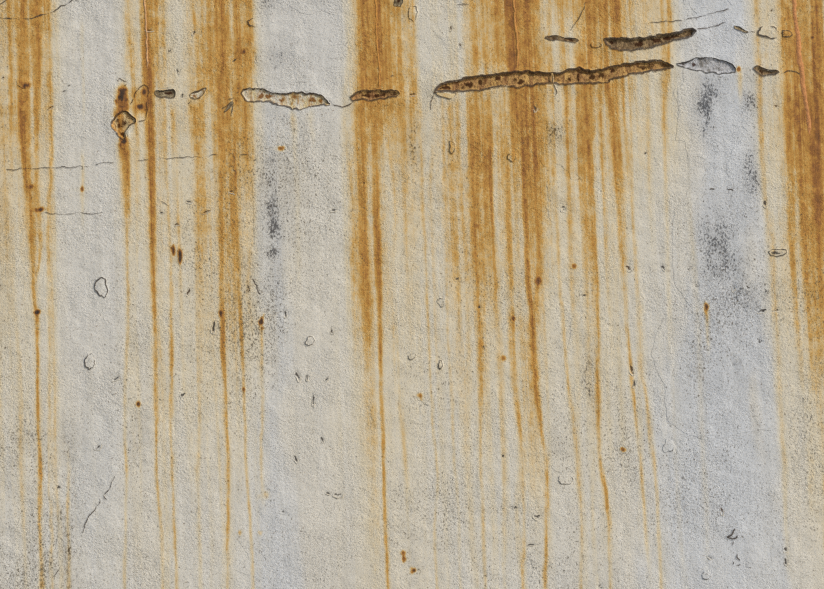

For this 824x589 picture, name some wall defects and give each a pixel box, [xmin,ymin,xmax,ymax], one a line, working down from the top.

corrosion [5,0,65,419]
crack [0,0,78,20]
corrosion [35,463,73,565]
peeling [111,84,207,141]
corrosion [109,0,271,589]
peeling [222,87,417,117]
corrosion [345,0,425,528]
corrosion [411,86,560,589]
corrosion [466,0,677,589]
peeling [430,22,800,111]
corrosion [735,0,824,409]
corrosion [775,430,796,586]